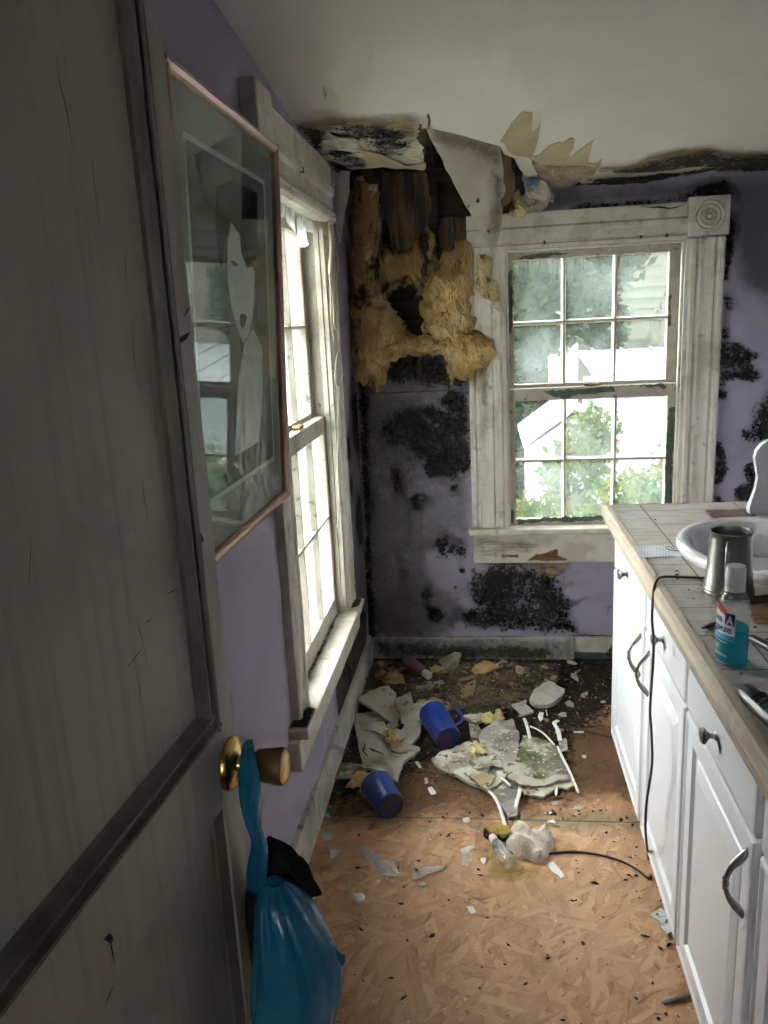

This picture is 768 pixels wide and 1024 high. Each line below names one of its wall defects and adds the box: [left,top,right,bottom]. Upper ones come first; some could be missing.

peeling [334,170,350,246]
peeling [322,138,424,166]
flaking render [500,147,555,214]
water stain [555,148,768,290]
peeling [518,252,569,260]
peeling [544,386,615,399]
mould [718,327,762,400]
mould [741,390,768,442]
peeling [664,407,675,503]
water stain [705,441,756,518]
water stain [335,355,578,717]
peeling [511,509,604,525]